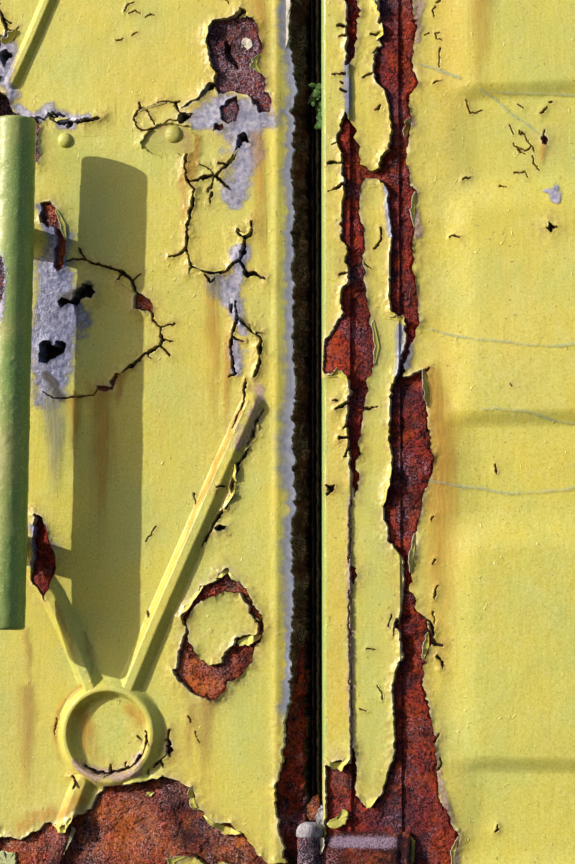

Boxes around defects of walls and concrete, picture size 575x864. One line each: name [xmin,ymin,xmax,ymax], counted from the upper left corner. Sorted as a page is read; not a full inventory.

crack [0,3,15,41]
corrosion [0,80,18,116]
corrosion [202,3,276,131]
crack [173,146,265,283]
peeling [31,204,99,409]
crack [117,312,176,375]
peeling [141,0,321,715]
crack [204,302,264,543]
corrosion [322,0,467,864]
corrosion [27,506,61,606]
crack [73,730,174,789]
corrosion [0,637,312,864]